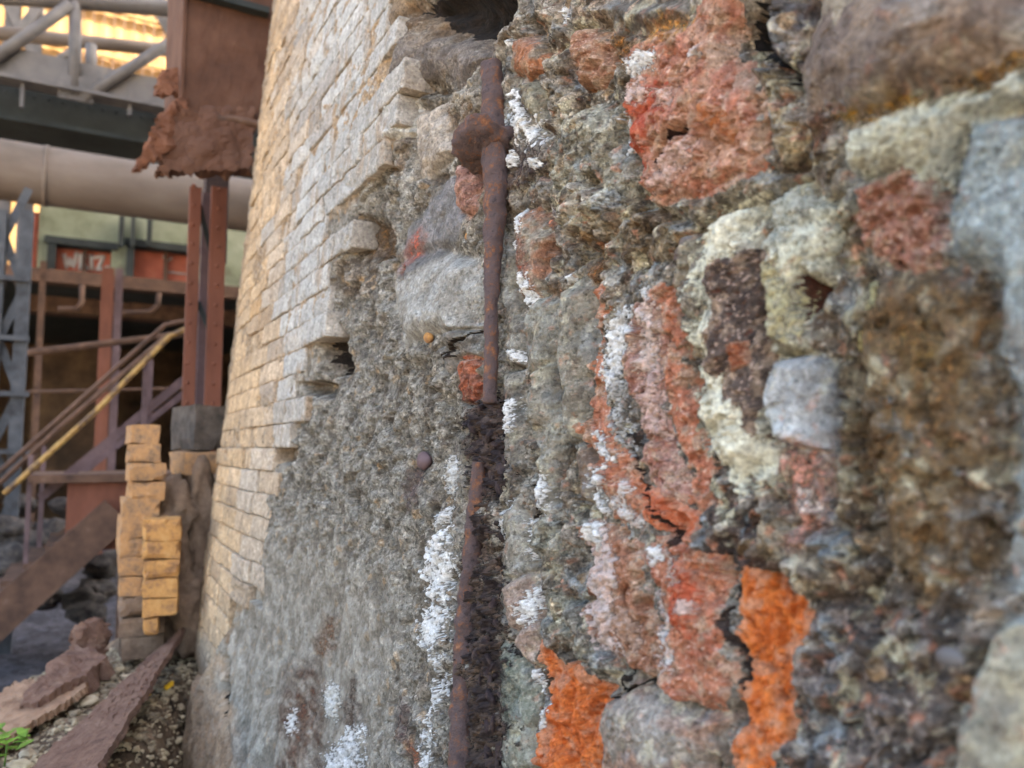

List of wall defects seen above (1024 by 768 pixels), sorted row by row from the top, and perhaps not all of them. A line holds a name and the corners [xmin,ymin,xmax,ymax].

spalling [423,0,518,41]
leakage [504,89,555,170]
spalling [569,0,804,207]
spalling [854,165,958,278]
spalling [330,342,355,376]
spalling [792,275,834,321]
corrosion [457,390,519,503]
leakage [577,285,678,659]
crack [611,400,686,562]
spalling [572,248,815,768]
leakage [412,455,461,768]
spalling [531,639,620,768]